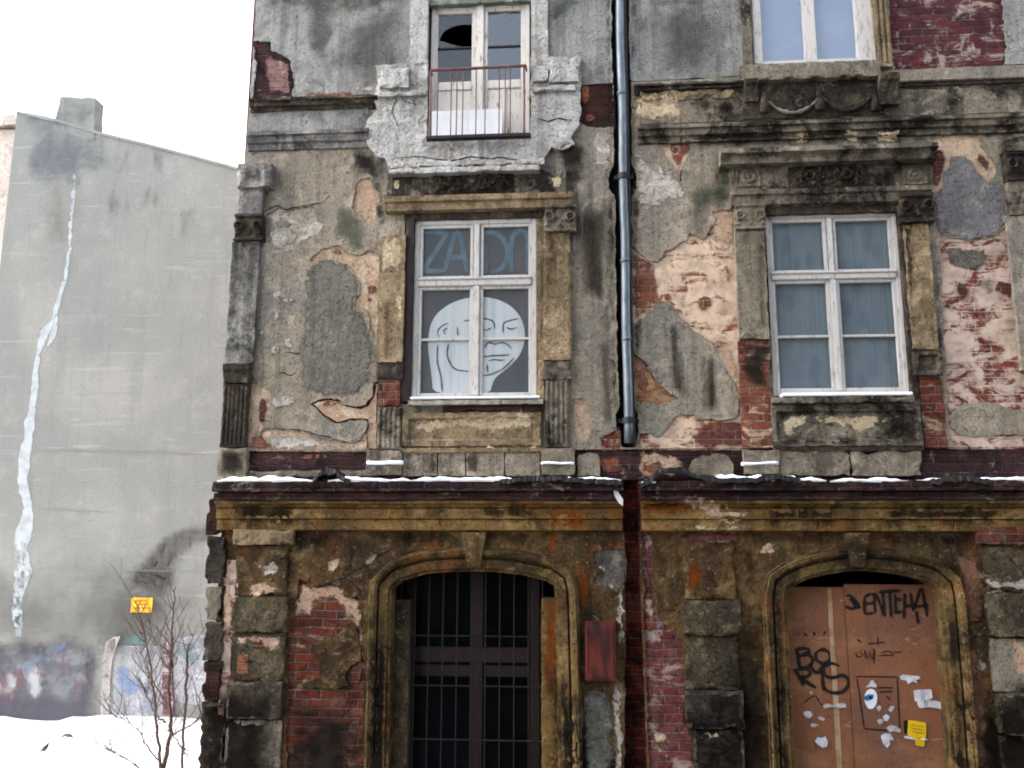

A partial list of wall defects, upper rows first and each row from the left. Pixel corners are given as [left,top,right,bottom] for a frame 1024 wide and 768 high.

flaking render [253,42,294,98]
crack [264,198,327,212]
crack [394,154,517,162]
flaking render [579,81,616,170]
peeling [631,92,684,121]
peeling [632,144,690,210]
flaking render [930,134,996,192]
flaking render [311,237,403,335]
flaking render [632,210,748,477]
flaking render [939,228,1024,450]
flaking render [223,558,366,768]
flaking render [640,530,694,768]